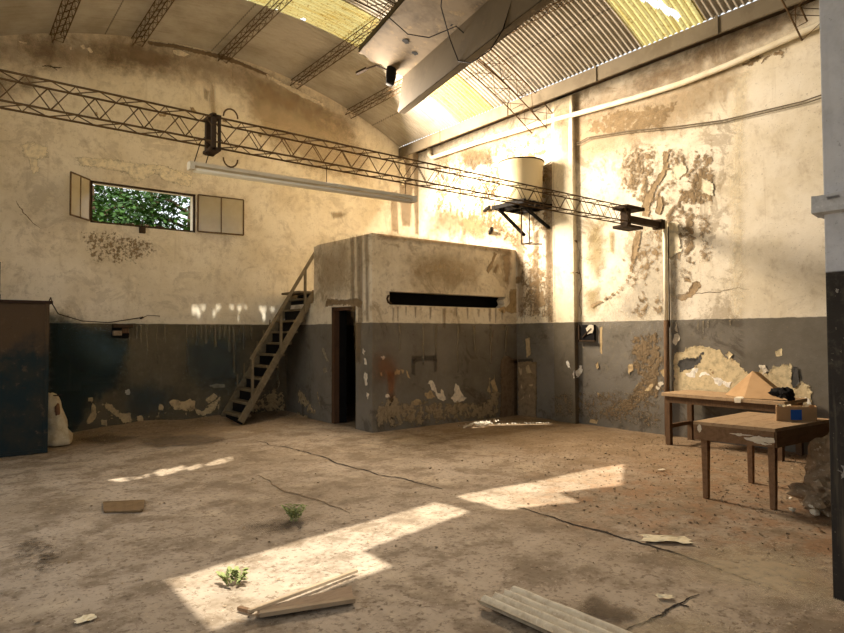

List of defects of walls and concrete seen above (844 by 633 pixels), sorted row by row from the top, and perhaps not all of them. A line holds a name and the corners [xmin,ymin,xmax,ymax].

peeling [591,145,714,317]
peeling [87,393,221,426]
flaking render [376,338,549,428]
peeling [554,321,748,427]
peeling [759,348,812,405]
crack [257,475,347,512]
crack [260,441,442,489]
crack [517,507,775,590]
crack [626,594,700,630]